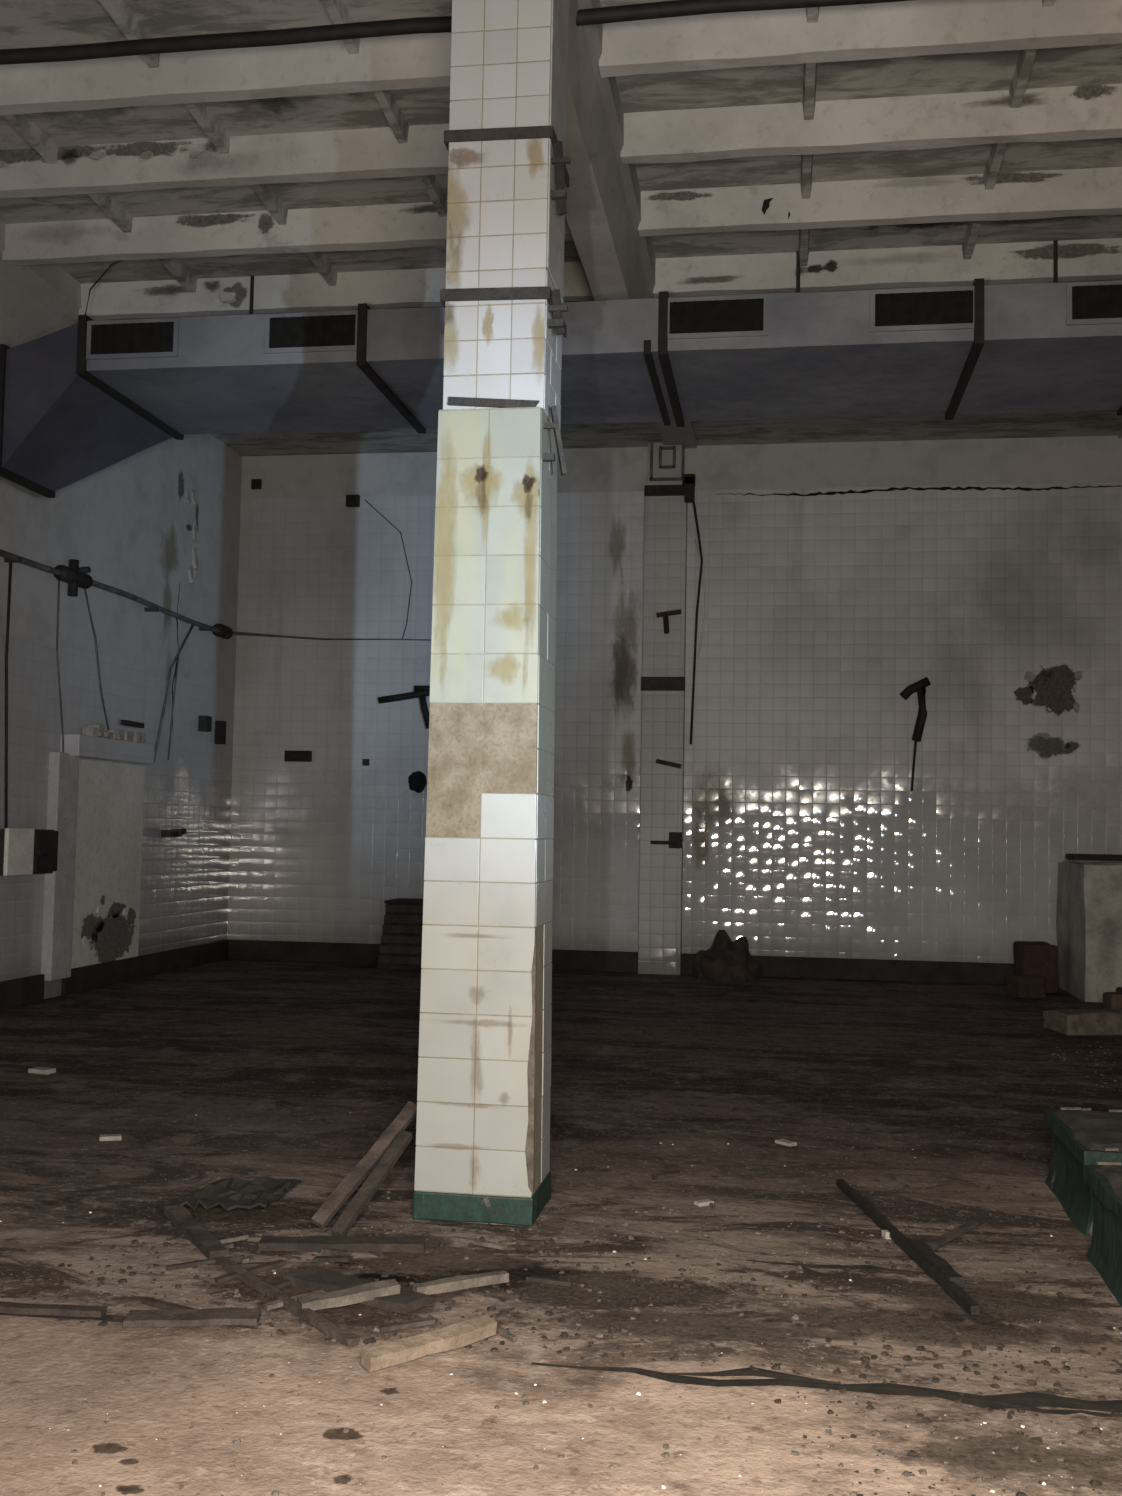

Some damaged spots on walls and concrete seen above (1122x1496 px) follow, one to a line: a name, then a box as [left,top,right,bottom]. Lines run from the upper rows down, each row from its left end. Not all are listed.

rust [475,467,487,482]
rust [523,476,535,492]
spalling [1014,664,1082,715]
spalling [1027,733,1079,758]
peeling [426,703,537,838]